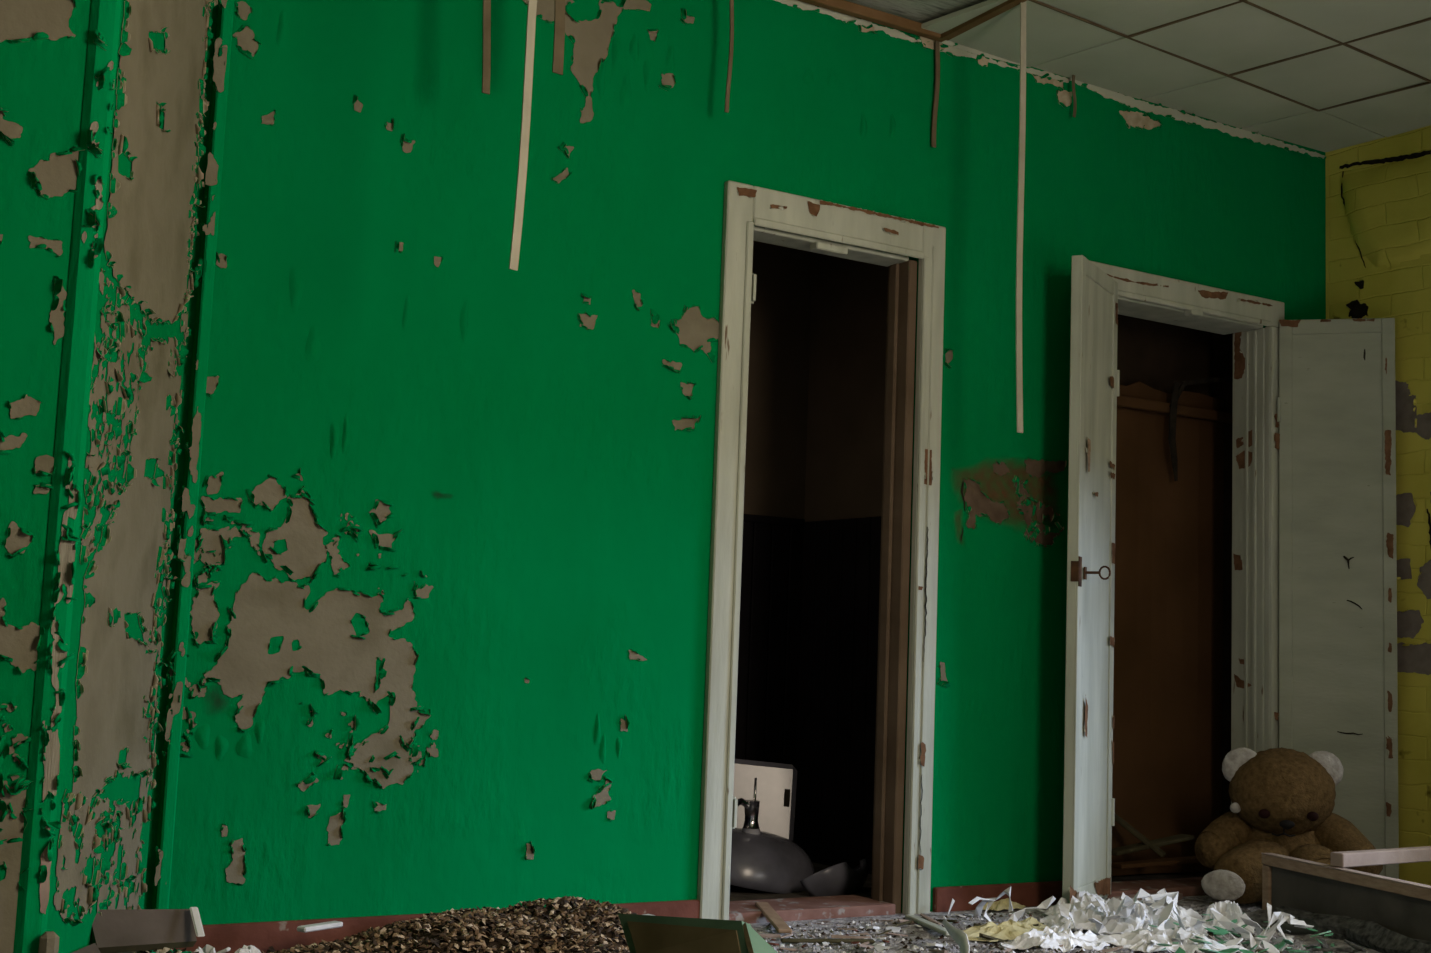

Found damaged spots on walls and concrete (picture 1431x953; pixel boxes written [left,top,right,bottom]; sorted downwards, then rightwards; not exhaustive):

peeling [523,0,651,124]
peeling [775,0,1326,159]
peeling [0,0,439,953]
peeling [632,290,719,431]
peeling [963,457,1068,548]
peeling [1384,358,1431,475]
peeling [1386,492,1431,675]
crack [1423,509,1431,548]
peeling [620,715,631,732]
peeling [587,769,616,821]